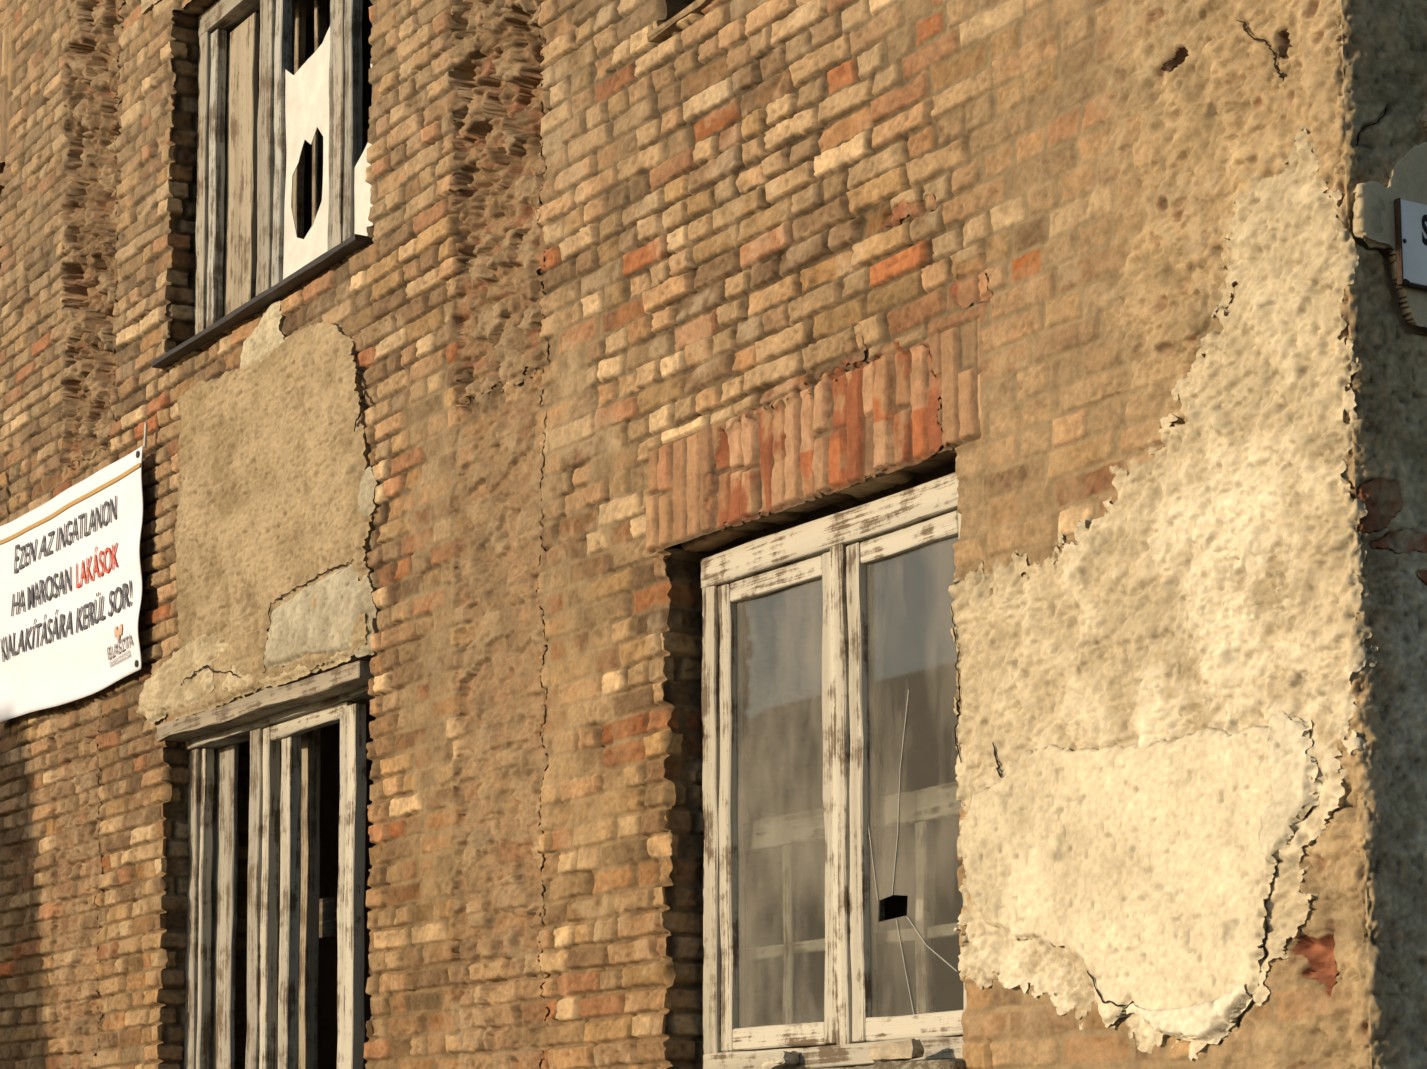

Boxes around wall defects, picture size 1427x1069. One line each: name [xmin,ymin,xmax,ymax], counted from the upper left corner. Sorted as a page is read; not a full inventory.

flaking render [948,111,1427,1061]